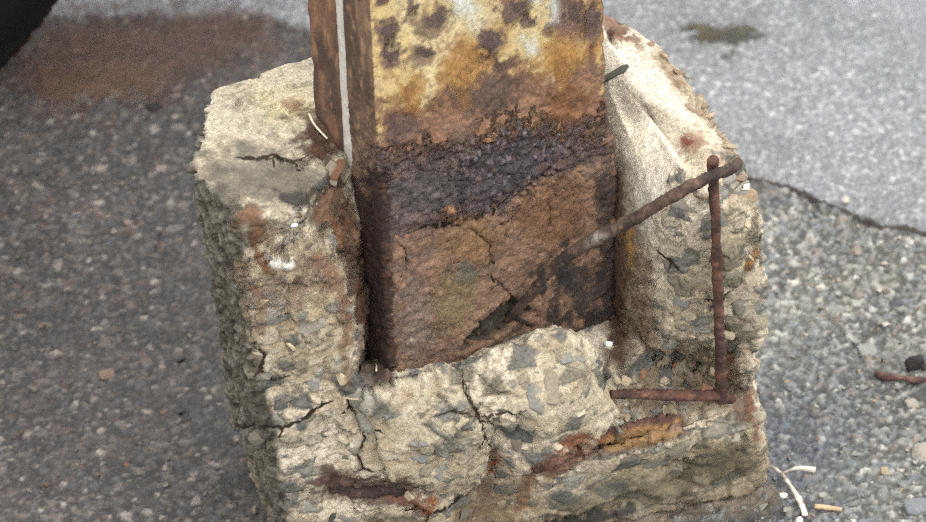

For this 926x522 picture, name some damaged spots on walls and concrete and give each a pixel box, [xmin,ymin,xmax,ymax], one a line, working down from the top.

rust [229,0,649,388]
crack [399,167,573,295]
crack [253,346,290,381]
spalling [511,219,754,451]
crack [262,388,383,478]
crack [438,371,524,449]
rust [537,418,688,479]
rust [310,464,437,516]
crack [400,495,467,522]